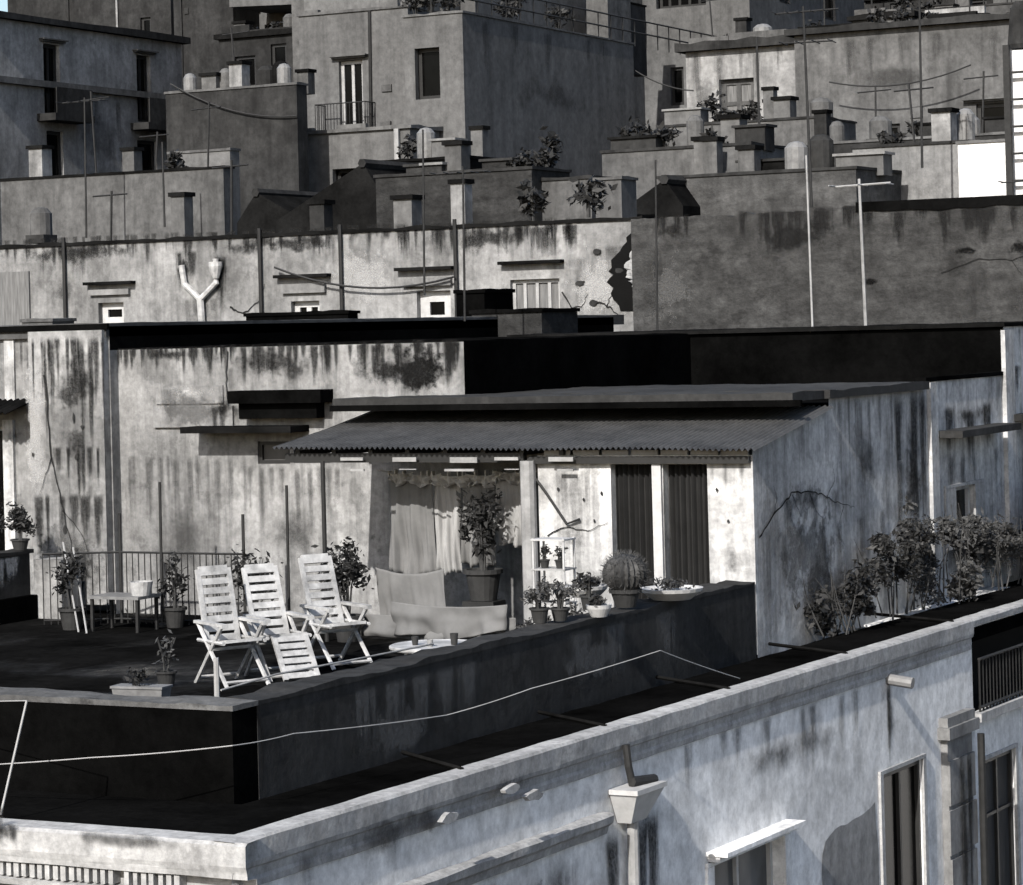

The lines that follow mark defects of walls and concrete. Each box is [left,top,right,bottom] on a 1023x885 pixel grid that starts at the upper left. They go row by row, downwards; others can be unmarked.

leakage [761,206,872,249]
leakage [117,340,459,392]
leakage [35,340,104,545]
leakage [212,401,237,426]
leakage [895,399,926,520]
leakage [946,405,990,444]
leakage [0,556,18,580]